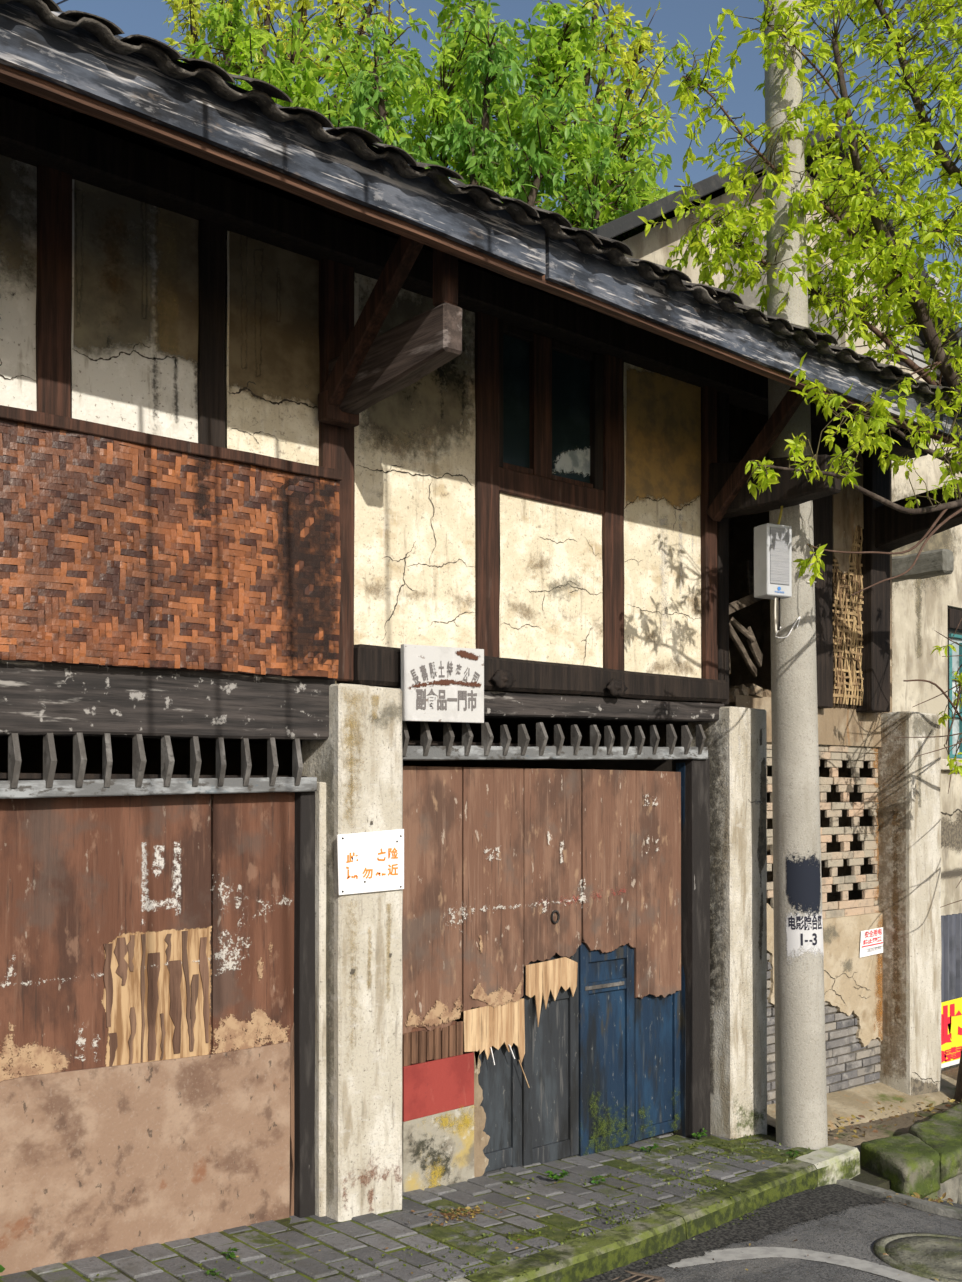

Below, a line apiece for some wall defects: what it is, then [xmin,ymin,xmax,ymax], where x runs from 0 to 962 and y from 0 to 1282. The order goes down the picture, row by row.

crack [72,345,191,365]
crack [227,381,318,441]
water stain [195,458,211,517]
water stain [269,476,338,672]
crack [359,465,475,635]
crack [431,581,601,630]
crack [631,603,701,620]
peeling [0,1022,69,1082]
peeling [211,1008,290,1054]
peeling [406,982,522,1027]
flaking render [825,1001,881,1093]